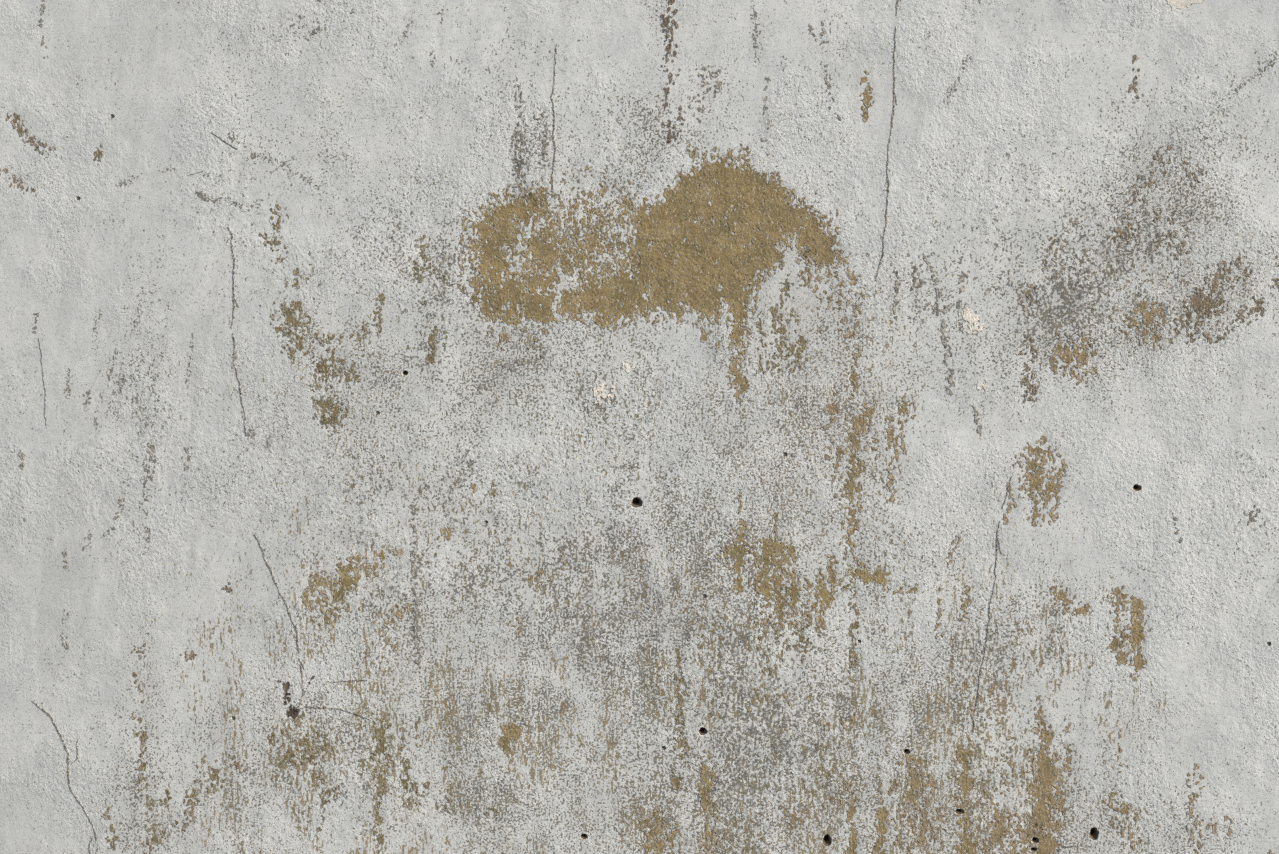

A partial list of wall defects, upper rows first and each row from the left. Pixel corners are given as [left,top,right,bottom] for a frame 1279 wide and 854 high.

crack [876,0,899,279]
peeling [259,204,387,433]
peeling [412,143,919,675]
peeling [1003,435,1068,526]
peeling [301,544,399,627]
peeling [375,594,412,651]
peeling [1106,585,1150,681]
peeling [742,693,812,711]
crack [32,701,98,854]
peeling [838,777,859,854]
peeling [872,695,1074,854]